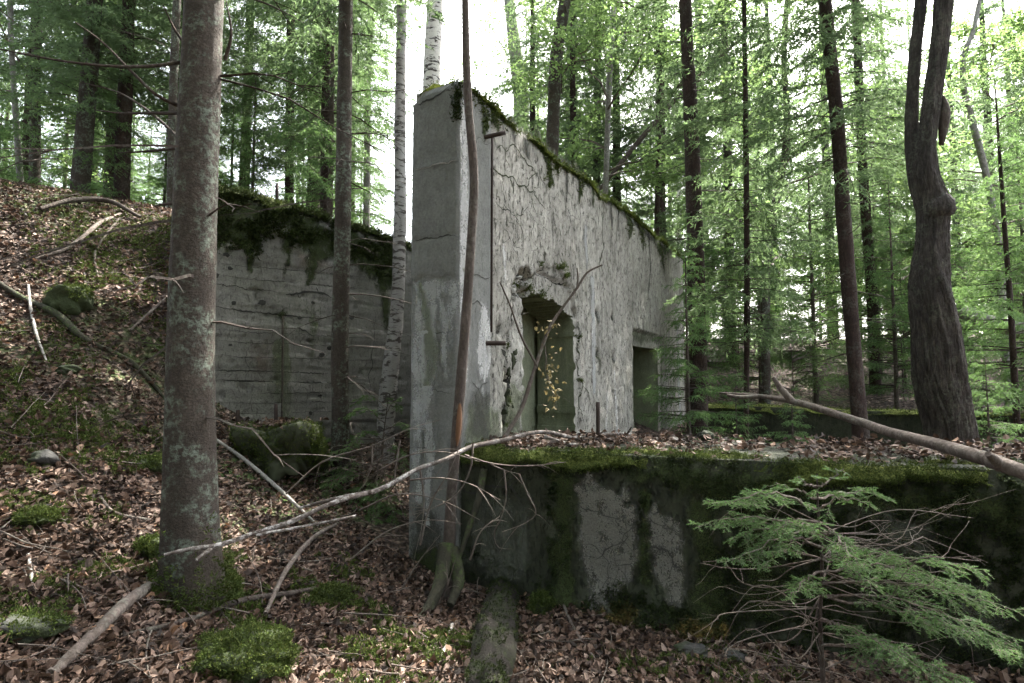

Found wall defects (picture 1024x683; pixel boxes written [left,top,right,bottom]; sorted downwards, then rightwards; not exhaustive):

crack [472,135,642,317]
water stain [305,253,319,286]
crack [472,349,512,427]